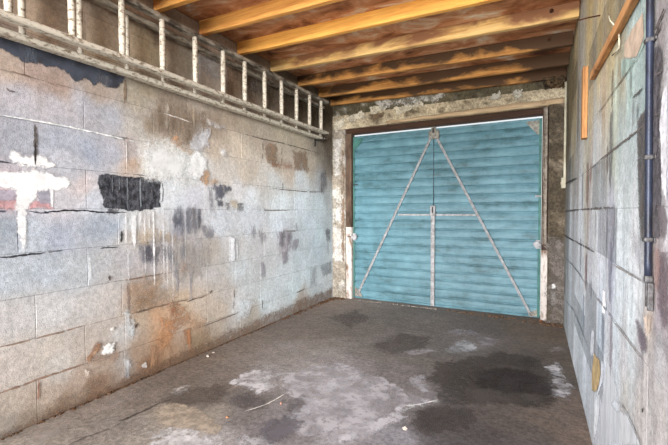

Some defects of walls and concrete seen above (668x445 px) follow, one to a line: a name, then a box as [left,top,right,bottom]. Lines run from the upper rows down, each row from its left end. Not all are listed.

crack [0,124,37,165]
crack [30,207,125,215]
water stain [138,207,201,264]
water stain [230,360,429,442]
water stain [236,435,276,445]